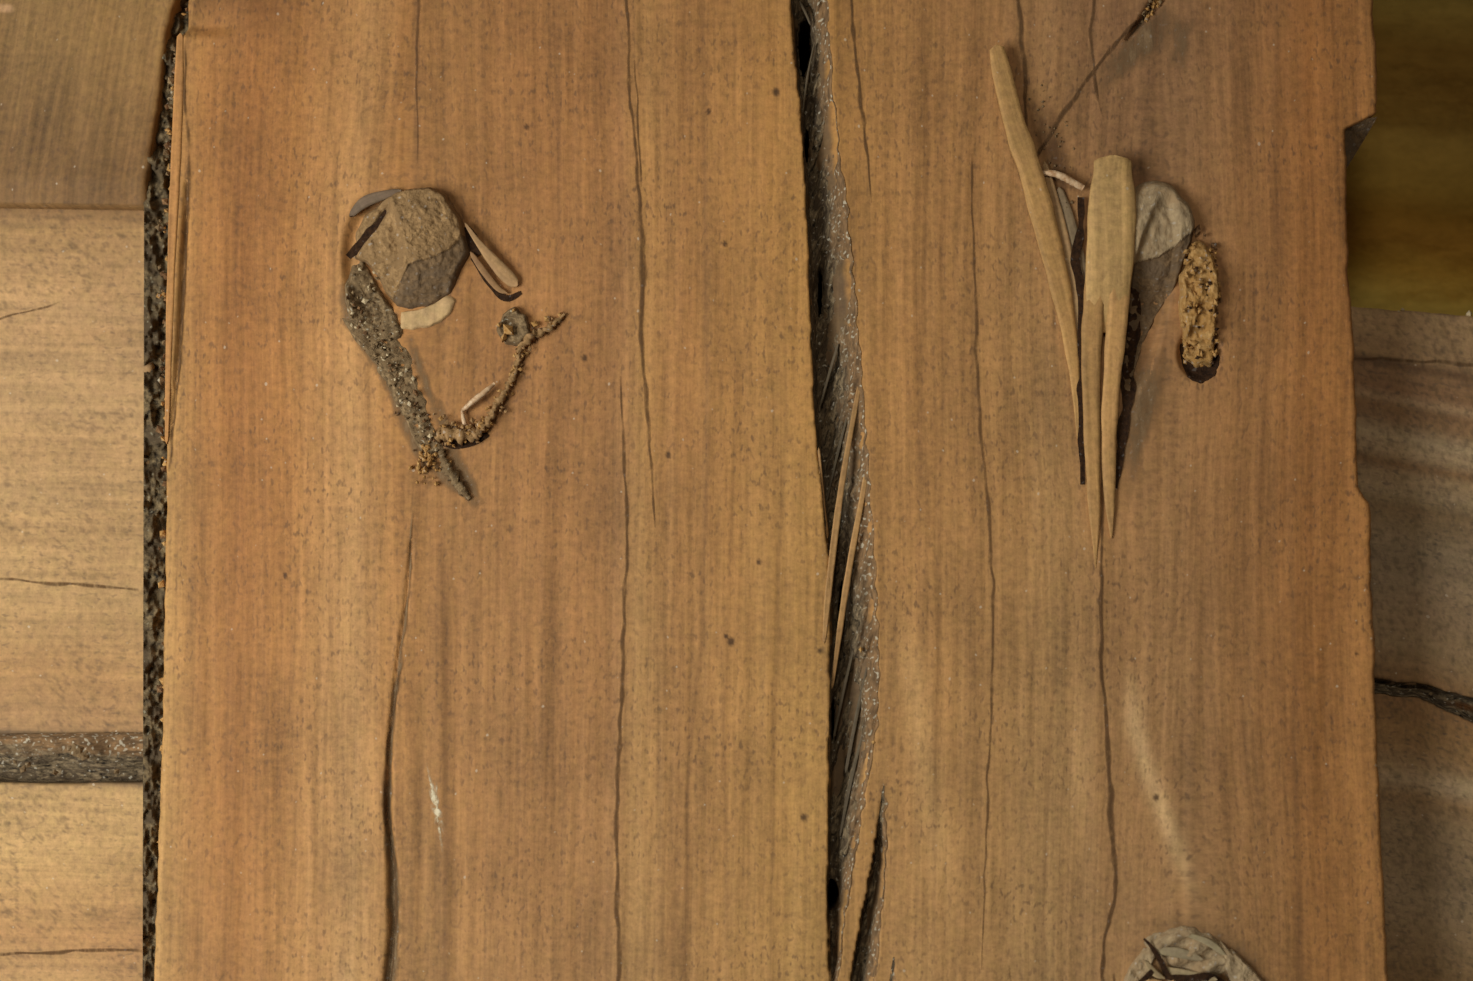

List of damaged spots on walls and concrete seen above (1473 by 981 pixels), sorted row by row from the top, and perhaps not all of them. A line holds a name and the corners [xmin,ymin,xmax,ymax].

crack [1017,0,1162,154]
peeling [349,189,402,217]
peeling [465,223,522,302]
crack [614,0,655,981]
crack [791,0,895,981]
crack [382,520,412,981]
crack [1374,679,1473,722]